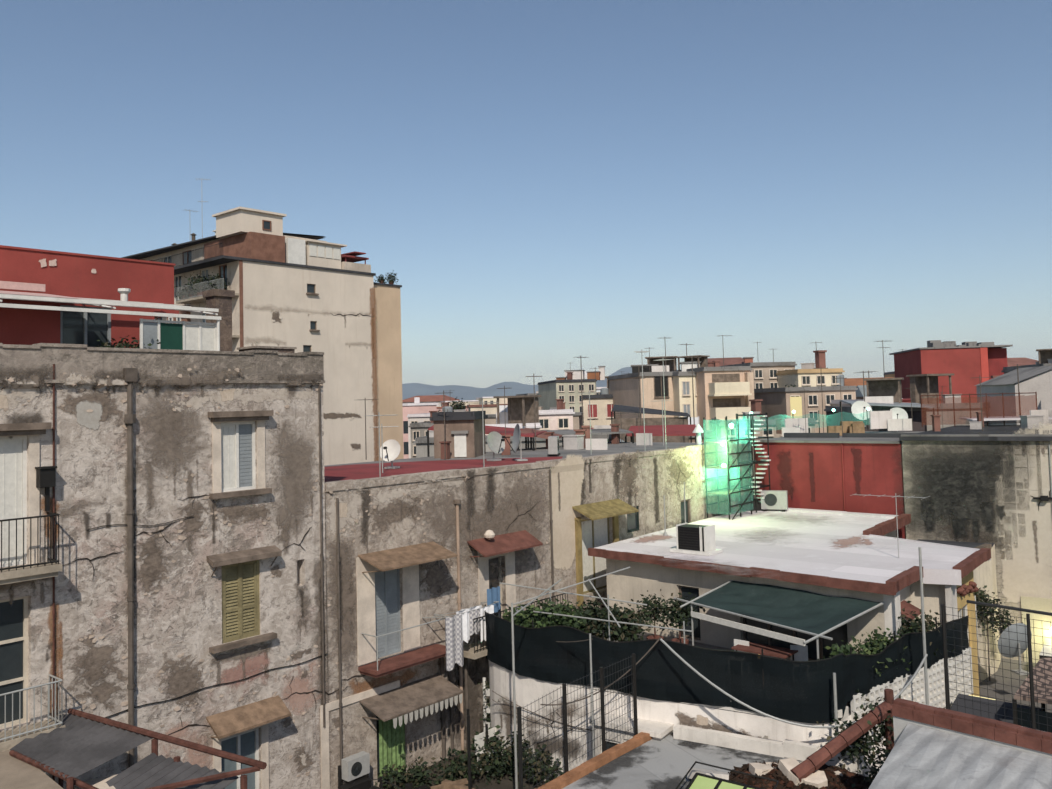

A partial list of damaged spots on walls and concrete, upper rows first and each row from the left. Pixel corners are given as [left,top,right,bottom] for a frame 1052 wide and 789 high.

flaking render [0,376,51,417]
spalling [58,372,128,430]
damp [61,502,111,536]
crack [62,495,210,576]
damp [93,366,243,604]
damp [271,373,323,554]
damp [613,457,631,499]
damp [904,431,1052,548]